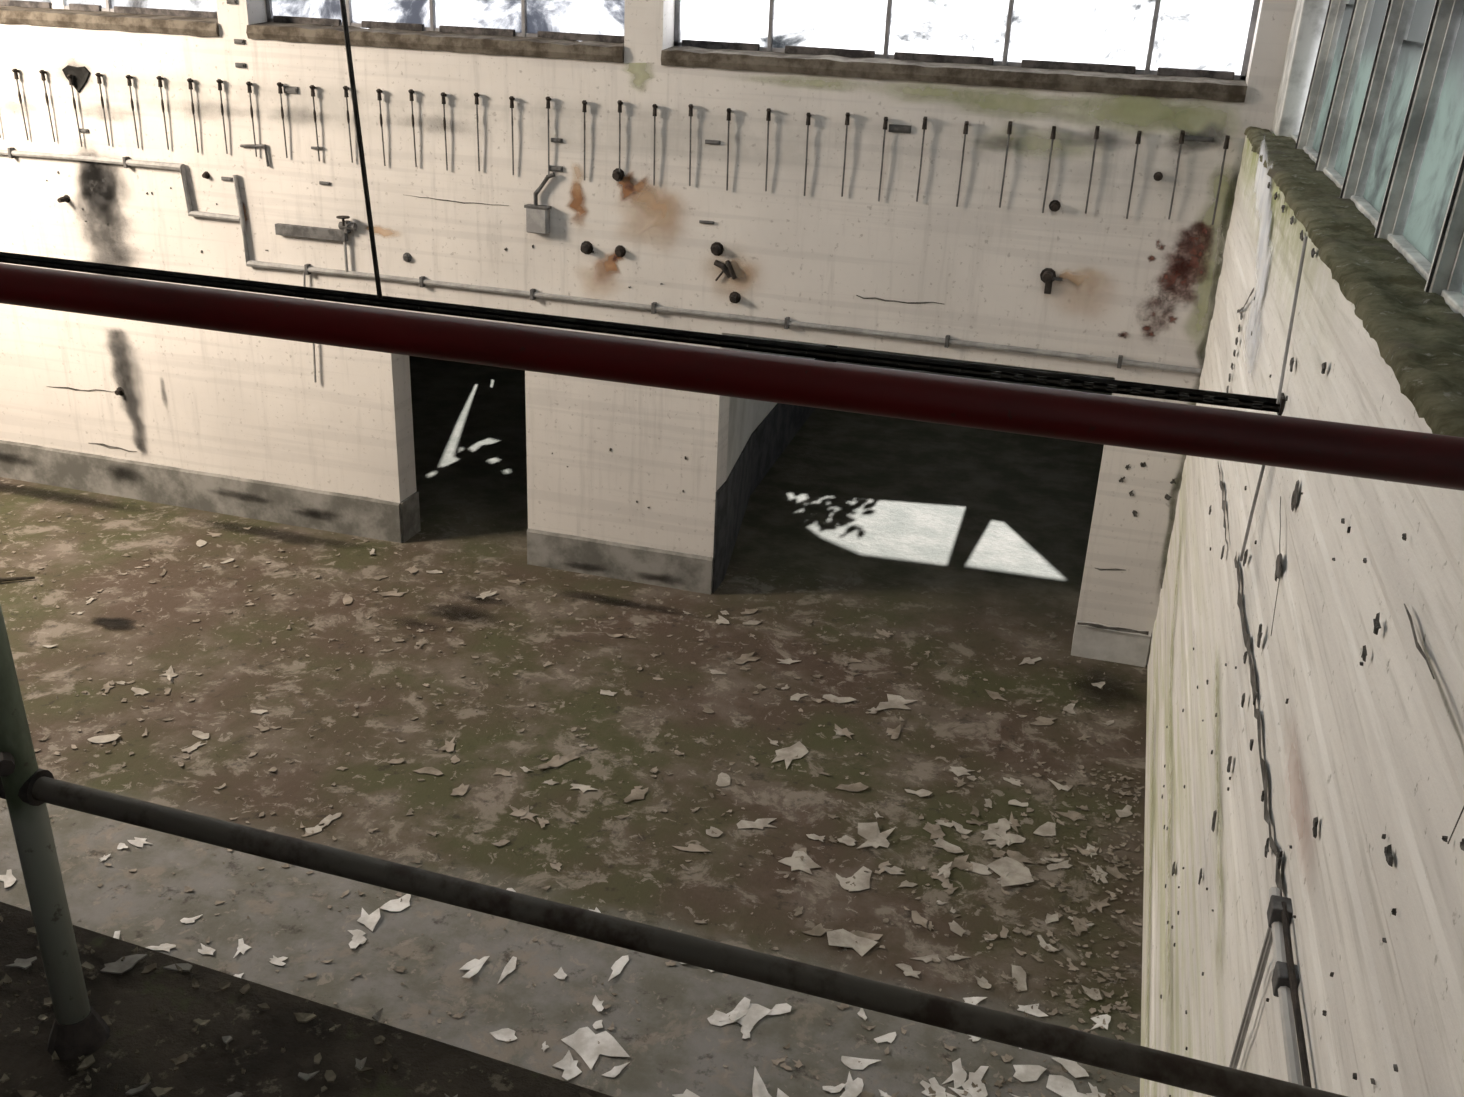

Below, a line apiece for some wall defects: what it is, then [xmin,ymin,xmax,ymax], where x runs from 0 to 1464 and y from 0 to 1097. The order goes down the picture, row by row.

damp [87,196,128,277]
rust [569,168,586,219]
rust [598,253,622,274]
rust [618,174,665,208]
rust [1118,222,1212,338]
damp [1267,182,1316,258]
damp [110,331,145,452]